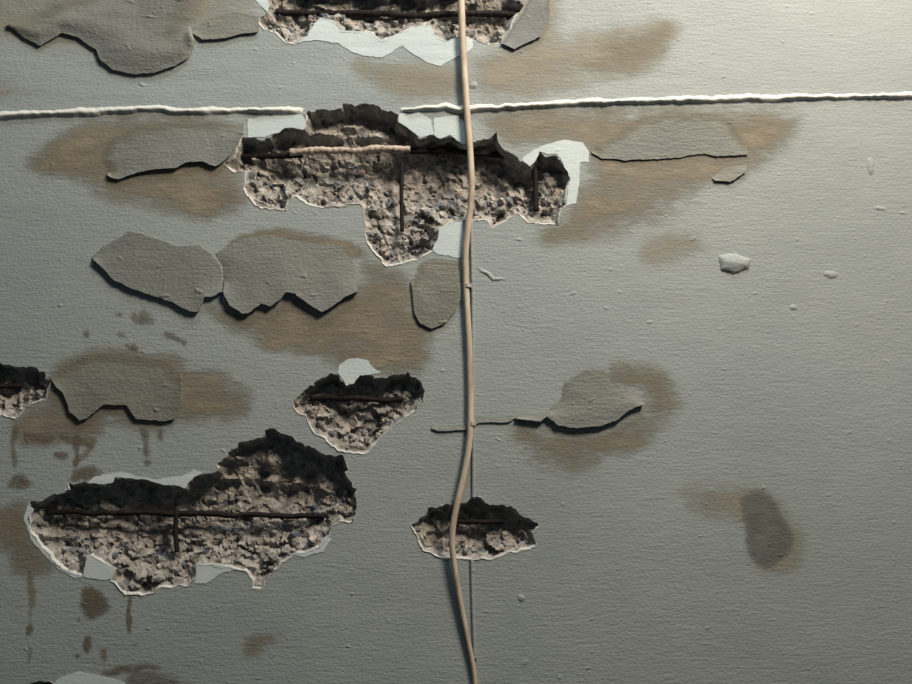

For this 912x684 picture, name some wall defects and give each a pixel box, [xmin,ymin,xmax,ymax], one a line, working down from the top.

spalling [7,0,550,74]
spalling [104,103,748,267]
peeling [0,356,182,421]
spalling [24,358,425,596]
spalling [410,496,539,560]
water stain [744,494,791,565]
spalling [30,672,125,684]